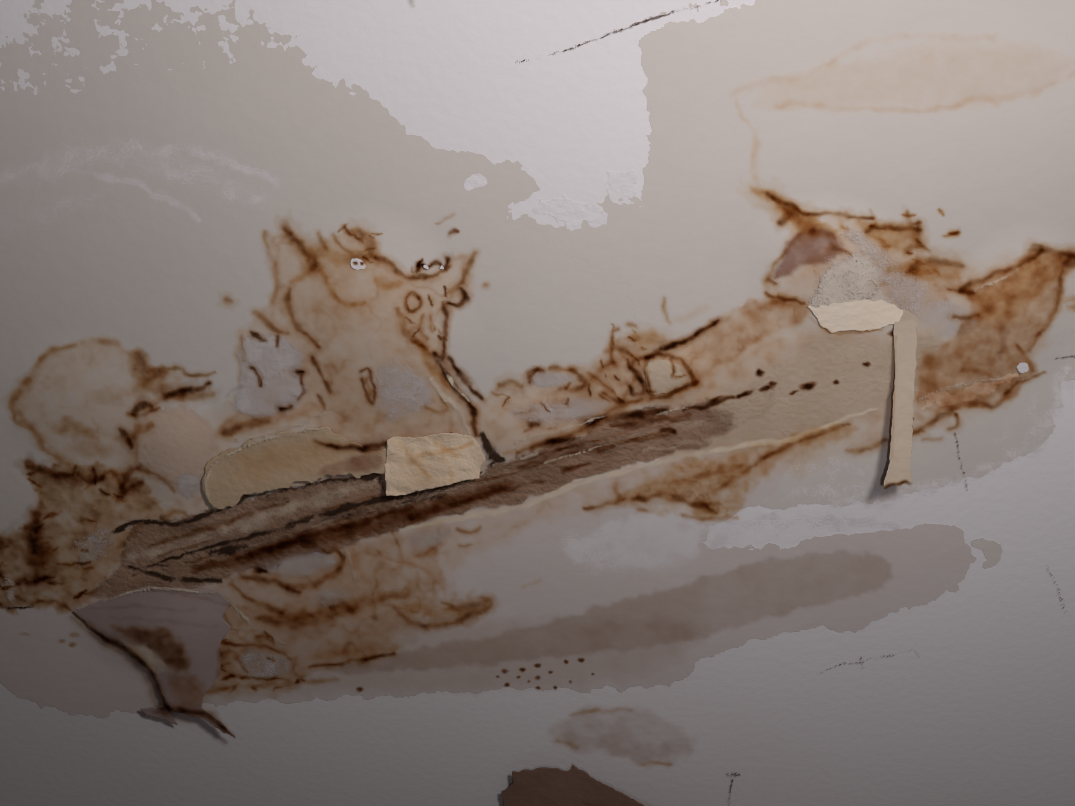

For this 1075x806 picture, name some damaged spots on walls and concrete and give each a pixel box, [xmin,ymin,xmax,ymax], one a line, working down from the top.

crack [523,0,719,61]
water stain [410,257,451,279]
water stain [361,282,484,436]
water stain [163,375,211,399]
water stain [222,327,330,442]
water stain [736,369,776,398]
water stain [319,441,386,452]
peeling [664,439,723,461]
peeling [724,435,755,448]
water stain [25,460,144,498]
peeling [971,538,1003,569]
peeling [73,586,235,738]